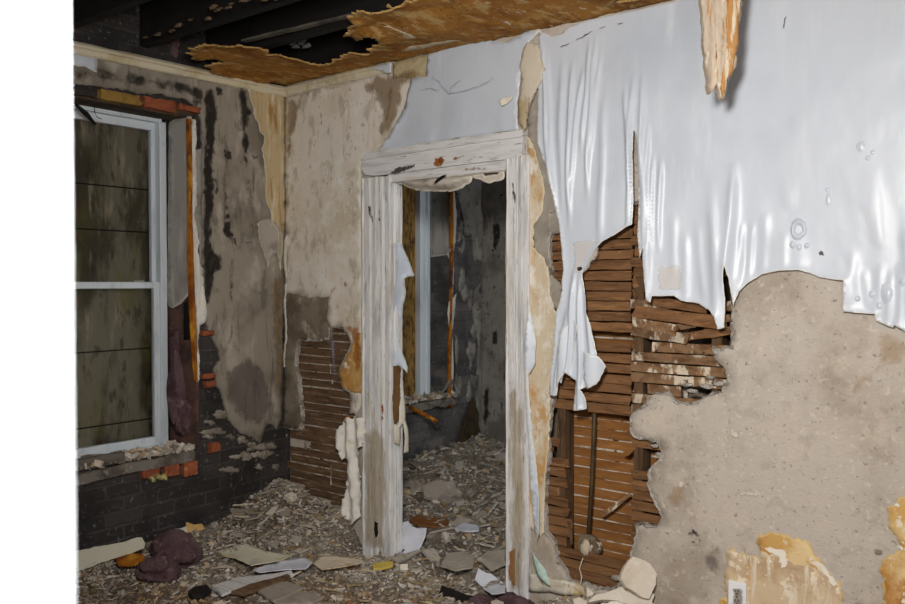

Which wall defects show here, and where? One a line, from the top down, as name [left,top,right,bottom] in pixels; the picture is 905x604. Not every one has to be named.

water stain [71,59,335,473]
peeling [247,54,428,509]
flaking render [517,42,737,592]
peeling [719,532,844,604]
peeling [879,496,905,604]